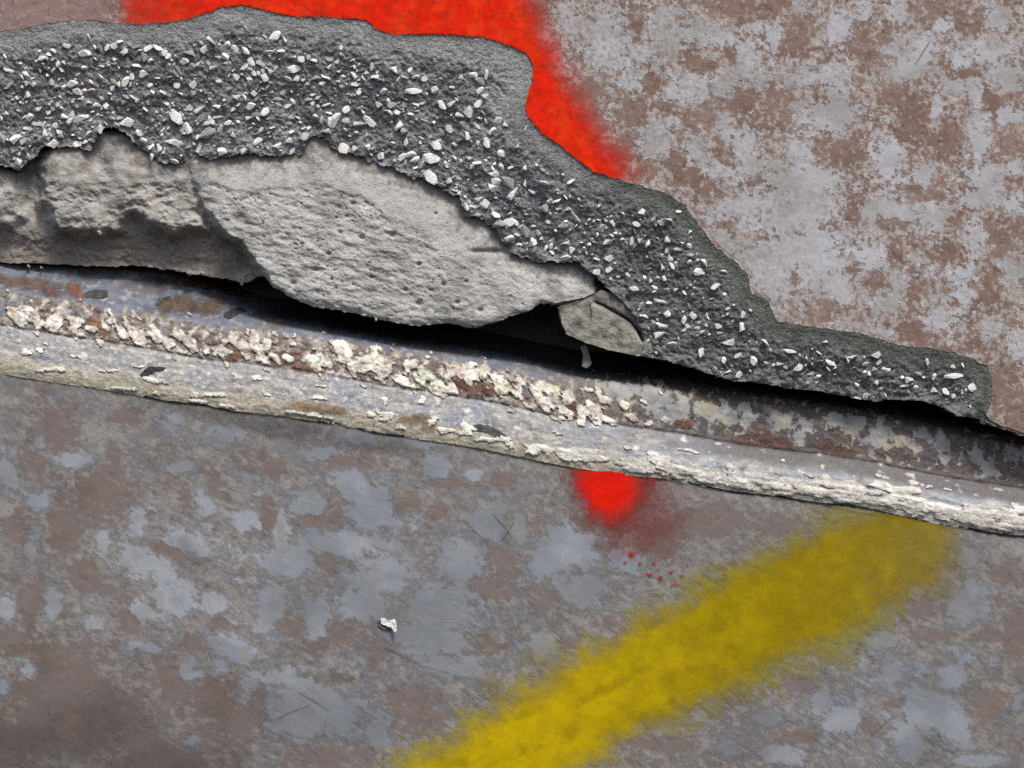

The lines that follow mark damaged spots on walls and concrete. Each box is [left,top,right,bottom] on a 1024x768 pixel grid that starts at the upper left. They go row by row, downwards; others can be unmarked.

spalling [0,0,1024,486]
crack [550,298,643,342]
corrosion [452,376,495,397]
corrosion [293,401,347,414]
corrosion [401,413,434,430]
corrosion [732,433,795,449]
peeling [0,365,1024,768]